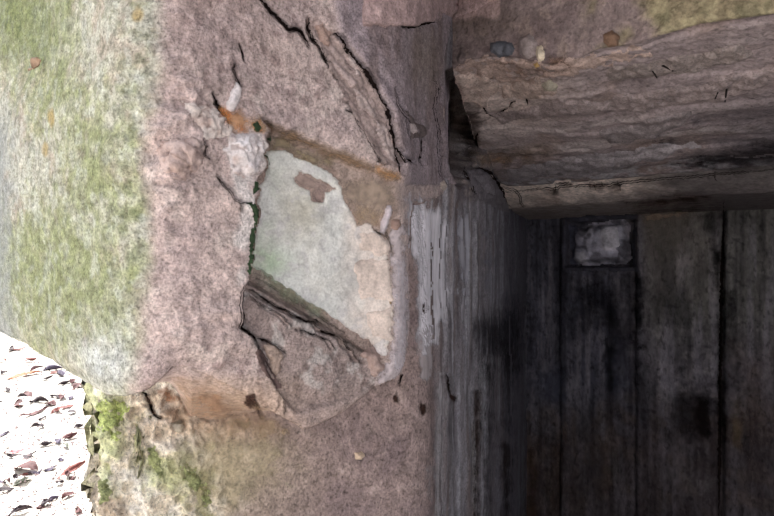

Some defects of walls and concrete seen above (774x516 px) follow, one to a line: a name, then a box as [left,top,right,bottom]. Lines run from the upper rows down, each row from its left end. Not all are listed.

rust [225,111,398,179]
crack [260,0,774,207]
crack [238,278,361,374]
peeling [251,150,470,389]